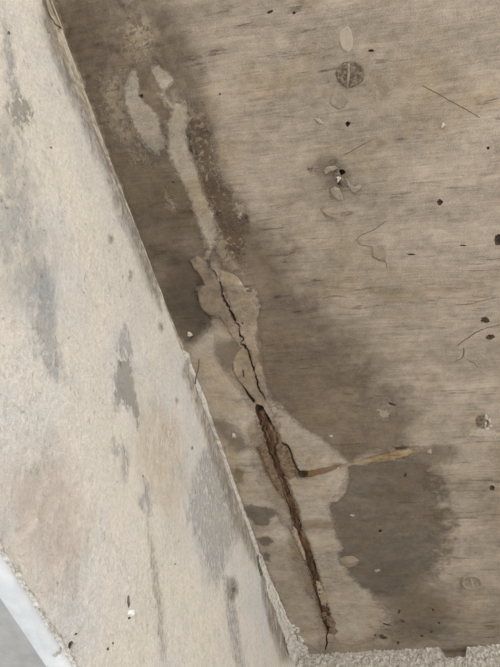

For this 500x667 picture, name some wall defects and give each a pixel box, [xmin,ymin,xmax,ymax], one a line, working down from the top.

crack [207,259,266,403]
water stain [56,0,459,658]
spalling [189,250,339,650]
crack [281,442,308,478]